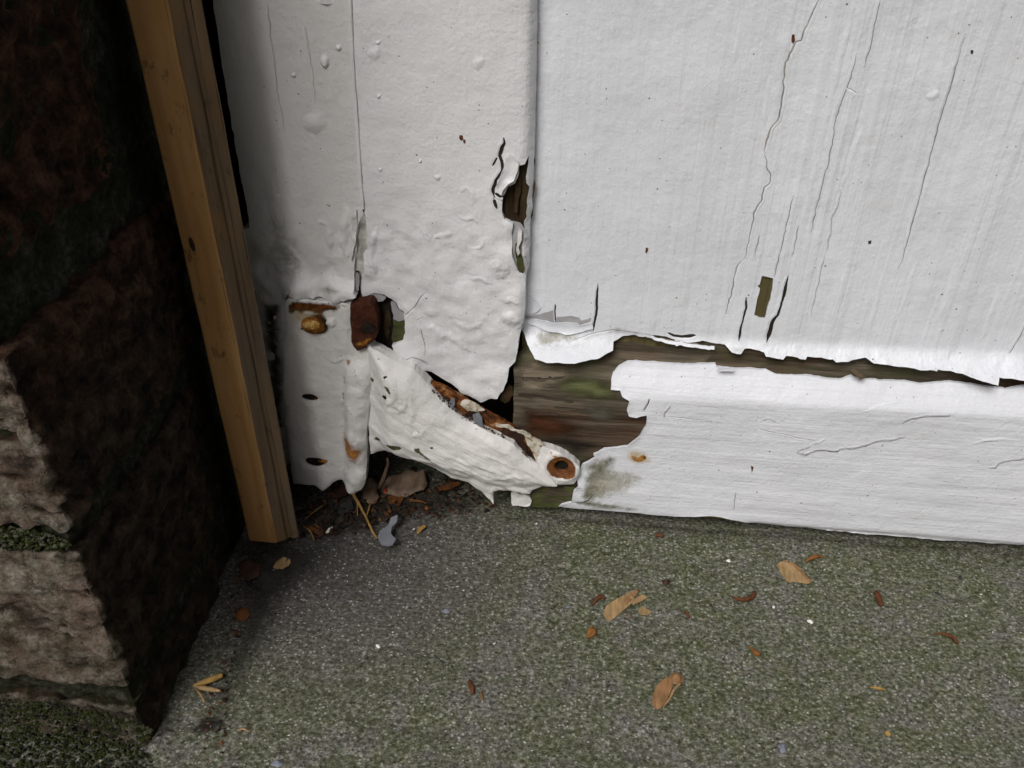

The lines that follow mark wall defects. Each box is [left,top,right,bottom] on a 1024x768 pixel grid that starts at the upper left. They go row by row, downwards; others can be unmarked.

crack [895,33,966,270]
peeling [496,154,519,195]
crack [571,0,880,350]
peeling [512,221,528,273]
peeling [754,276,773,317]
corrosion [289,302,339,333]
peeling [518,363,613,451]
corrosion [501,426,575,479]
crack [757,414,950,455]
peeling [511,486,575,508]
damp [584,472,631,508]